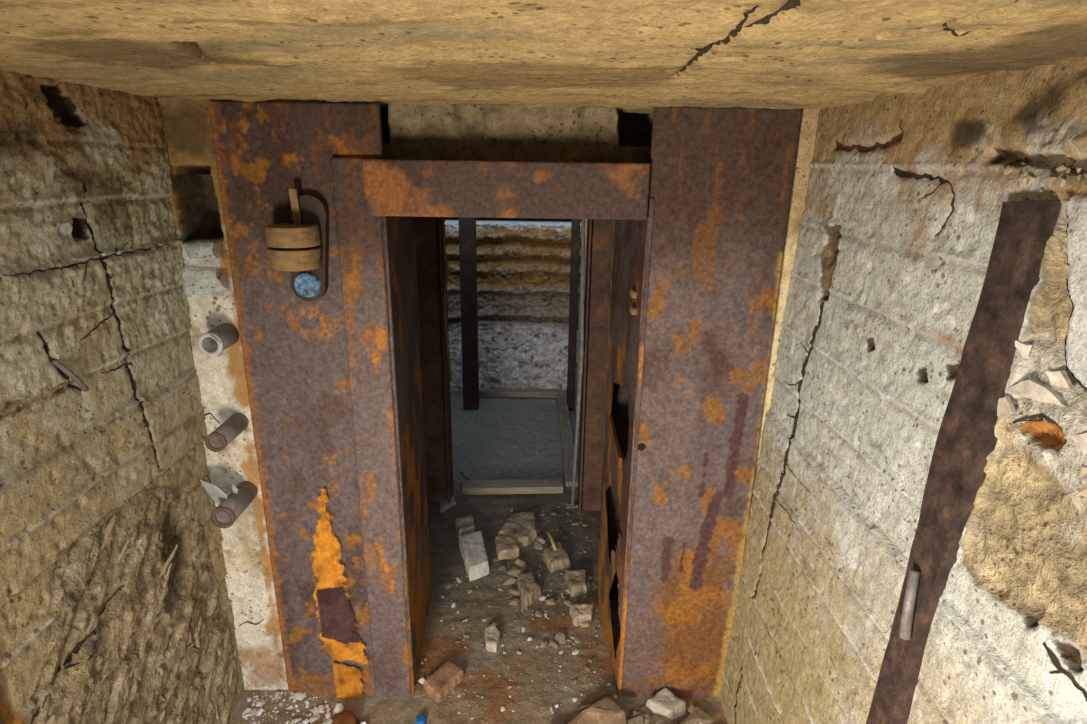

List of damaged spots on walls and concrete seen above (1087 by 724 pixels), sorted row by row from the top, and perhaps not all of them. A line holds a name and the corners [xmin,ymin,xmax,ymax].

crack [892,166,955,237]
crack [3,183,174,468]
rust [228,323,249,406]
crack [752,232,841,599]
spalling [946,364,960,380]
spalling [960,149,1087,673]
rust [242,445,280,646]
rust [311,489,368,699]